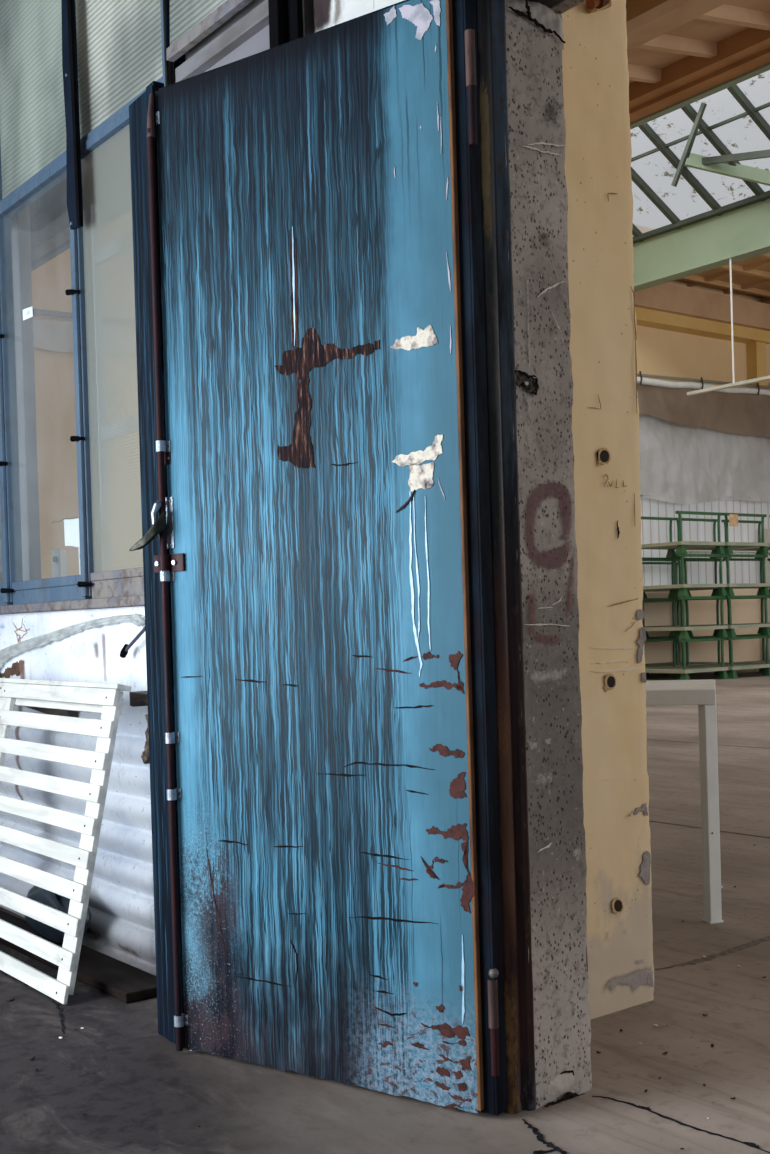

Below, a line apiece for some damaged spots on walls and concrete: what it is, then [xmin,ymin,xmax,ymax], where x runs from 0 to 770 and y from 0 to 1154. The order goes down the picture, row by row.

damp [314,0,340,30]
peeling [384,0,441,40]
peeling [275,325,452,469]
peeling [392,434,446,500]
corrosion [419,651,464,694]
corrosion [429,744,464,758]
corrosion [421,823,475,913]
crack [654,936,770,970]
peeling [605,961,651,991]
corrosion [421,1004,471,1109]
crack [522,1119,567,1154]
crack [592,1096,770,1153]